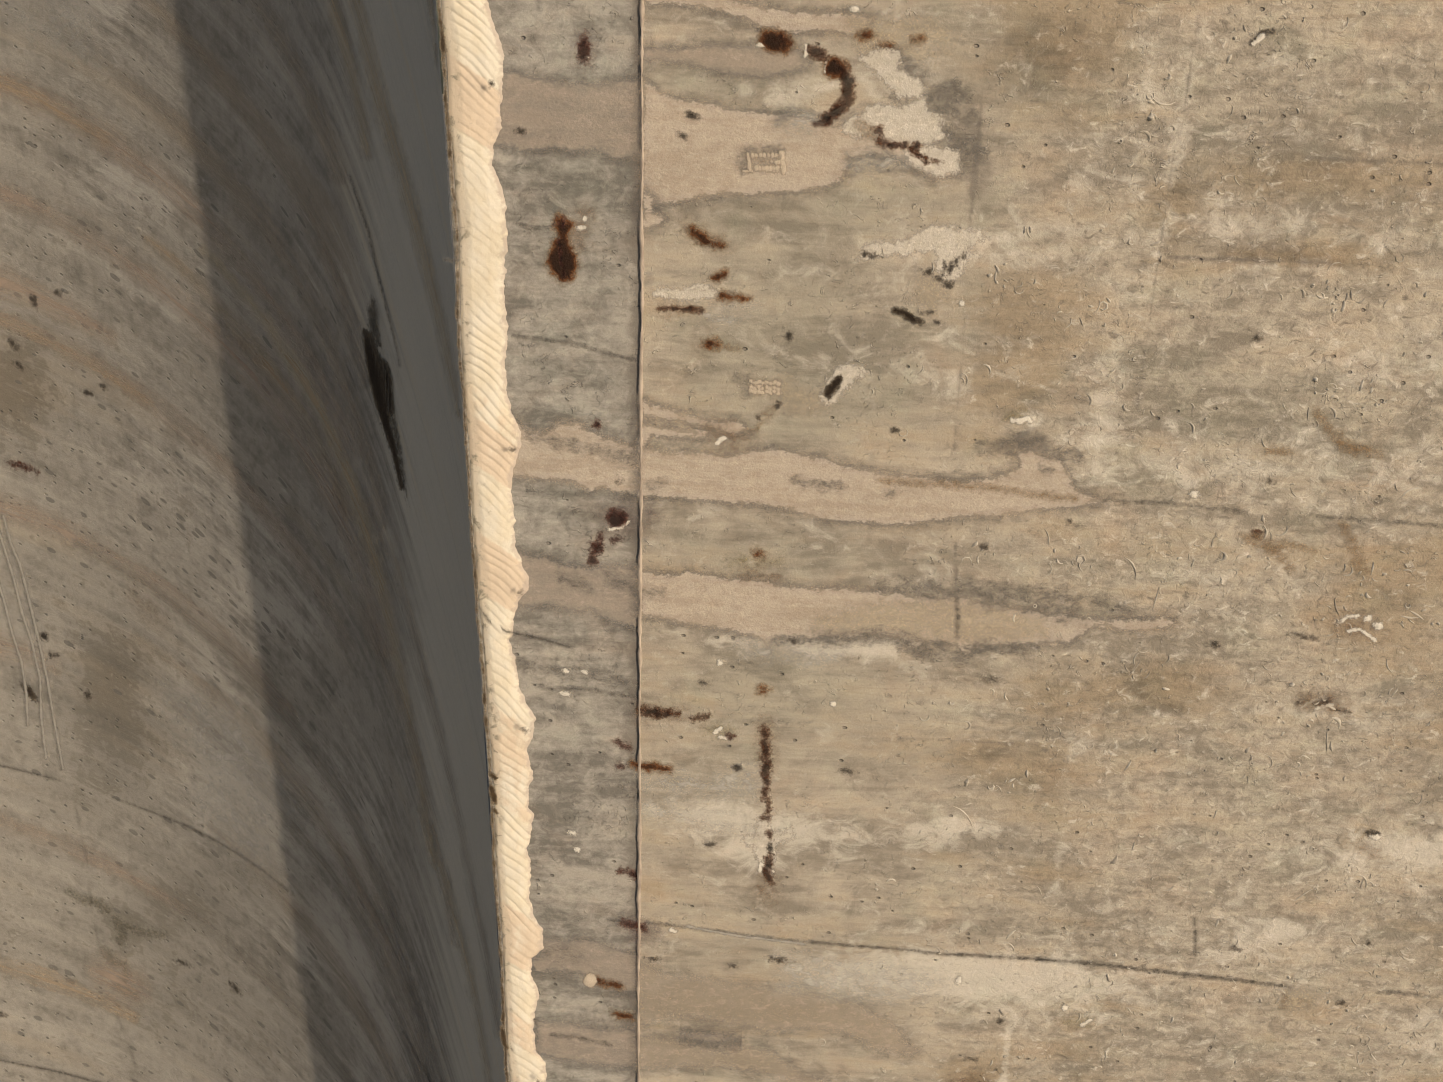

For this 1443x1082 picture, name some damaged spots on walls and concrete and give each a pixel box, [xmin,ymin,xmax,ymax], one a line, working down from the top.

rust [756,29,940,166]
rust [545,214,588,282]
rust [689,225,726,249]
rust [710,270,751,303]
rust [657,305,704,314]
rust [702,337,739,350]
spalling [362,299,407,496]
rust [587,506,630,564]
rust [637,706,710,722]
rust [615,739,672,773]
rust [758,725,775,890]